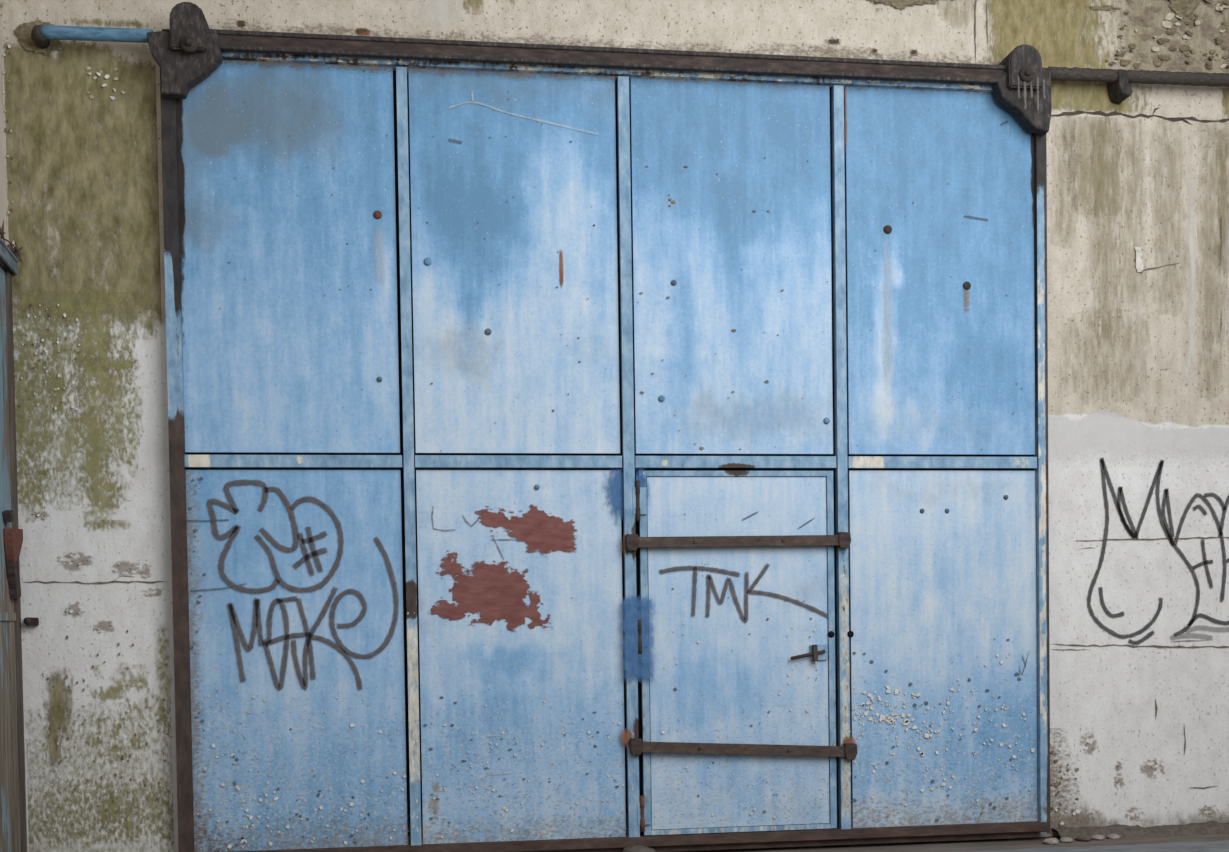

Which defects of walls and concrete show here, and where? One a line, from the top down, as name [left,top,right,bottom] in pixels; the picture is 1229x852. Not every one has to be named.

crack [1051,107,1229,125]
damp [1185,214,1213,375]
damp [13,285,156,521]
damp [44,670,72,763]
damp [92,629,170,757]
damp [102,794,141,841]
peeling [1050,728,1091,833]